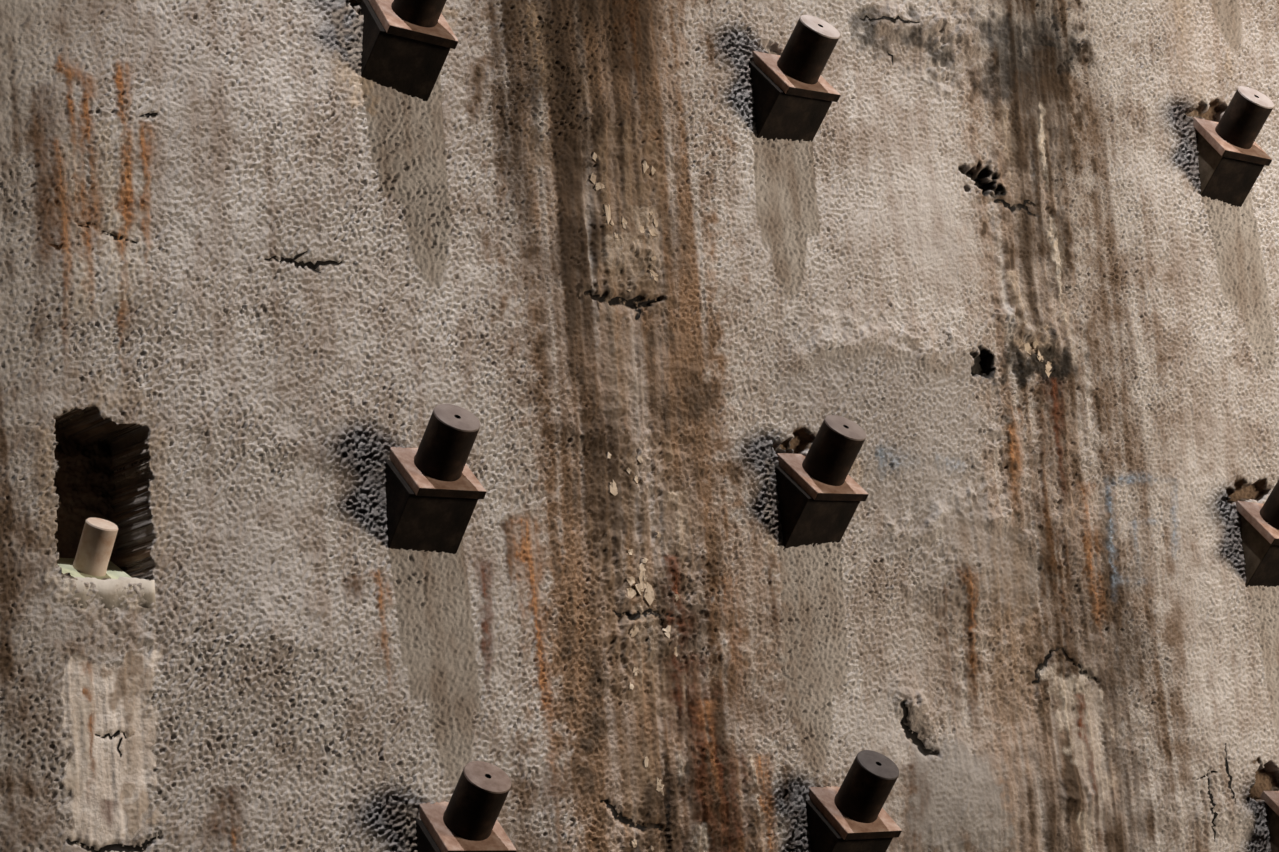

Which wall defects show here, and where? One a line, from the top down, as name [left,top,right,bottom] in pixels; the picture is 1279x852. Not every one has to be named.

rust [58,57,92,143]
rust [115,65,151,252]
damp [494,0,598,295]
damp [855,10,875,42]
damp [905,29,947,61]
damp [980,0,1080,323]
crack [584,290,661,320]
damp [1003,343,1077,396]
damp [584,409,620,541]
rust [504,518,551,709]
damp [1039,670,1083,726]
damp [646,712,733,852]